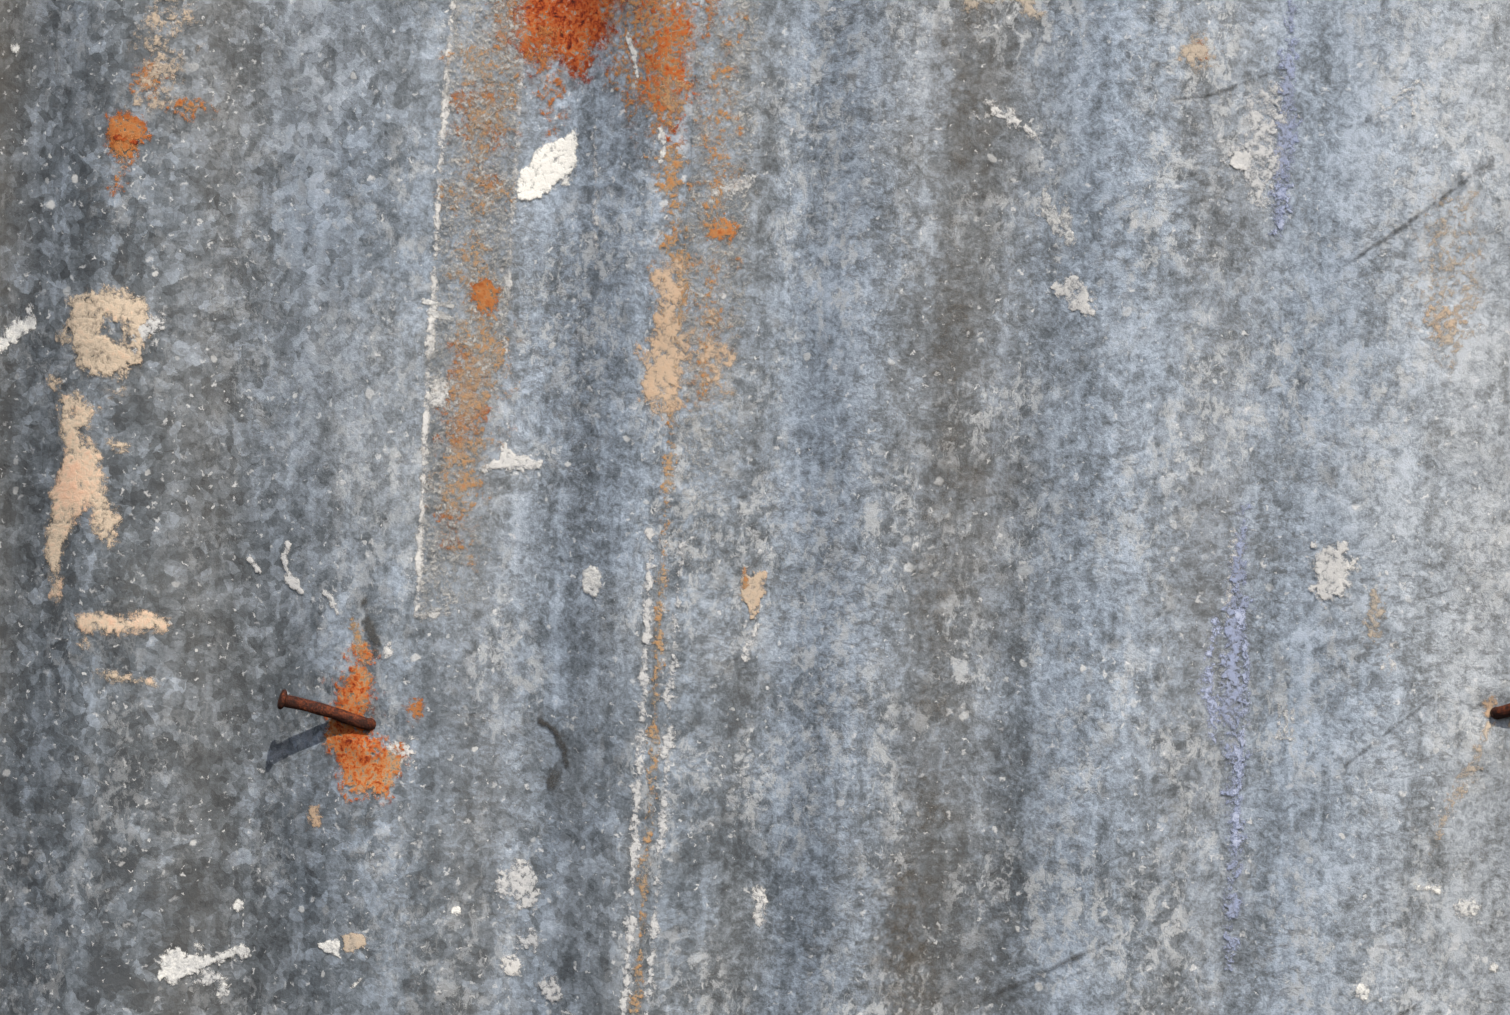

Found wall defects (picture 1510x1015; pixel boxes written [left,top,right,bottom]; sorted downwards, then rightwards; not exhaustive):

corrosion [105,0,216,197]
corrosion [429,0,739,1015]
corrosion [322,598,417,803]
corrosion [405,698,424,718]
corrosion [307,805,322,827]